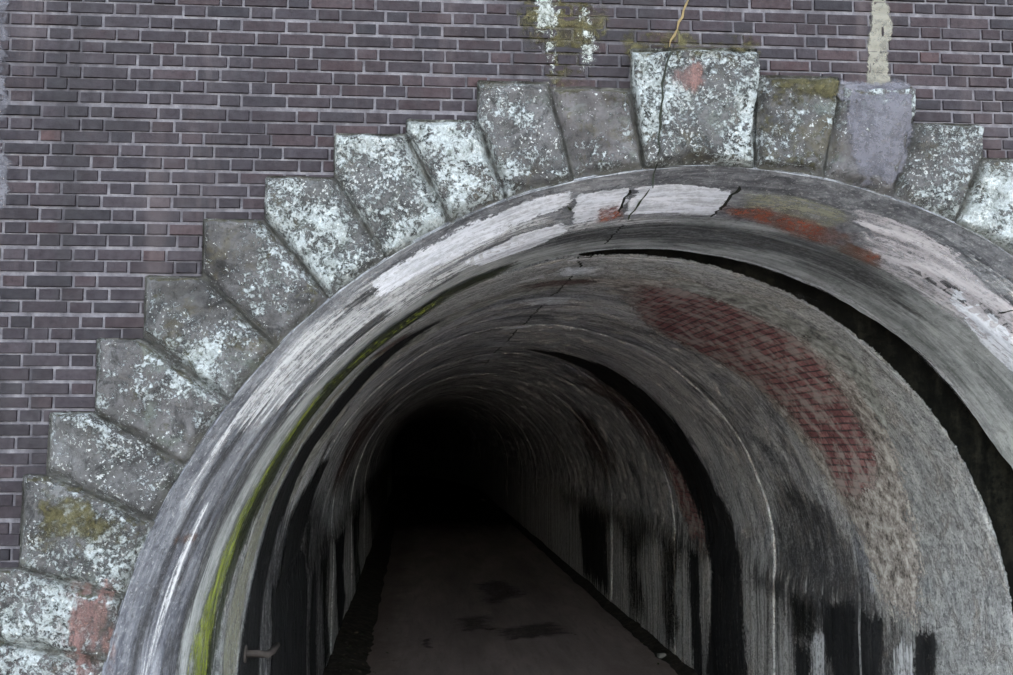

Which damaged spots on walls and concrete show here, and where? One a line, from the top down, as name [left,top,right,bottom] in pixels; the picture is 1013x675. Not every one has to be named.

water stain [130,215,1013,675]
crack [468,0,689,368]
spalling [287,276,929,635]
peeling [372,184,1013,372]
crack [710,186,741,217]